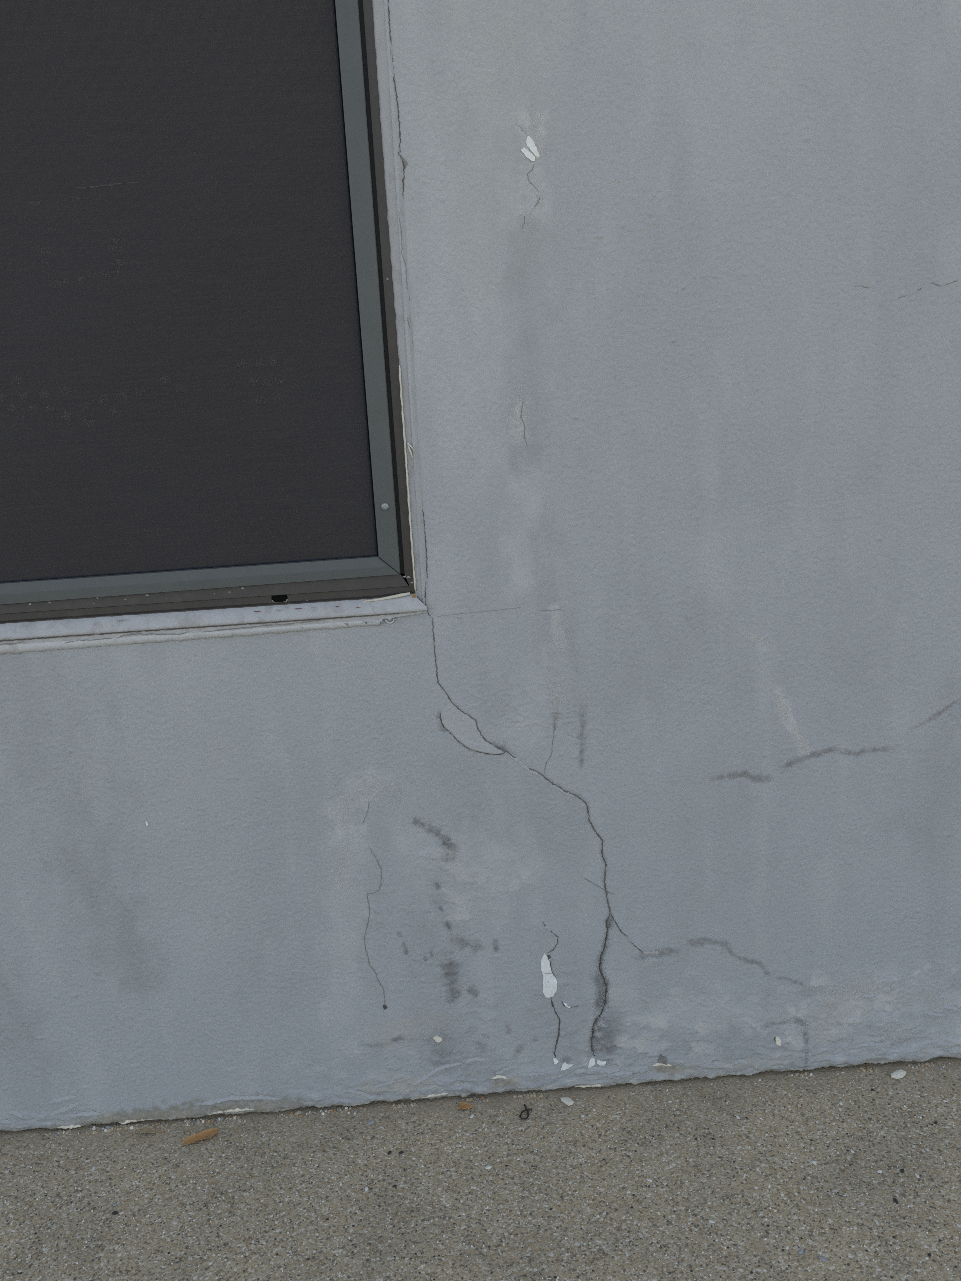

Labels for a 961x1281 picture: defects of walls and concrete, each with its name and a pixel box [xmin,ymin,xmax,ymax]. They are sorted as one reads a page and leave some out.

peeling [516,111,543,161]
crack [422,509,644,1058]
crack [362,801,387,1010]
peeling [540,953,557,998]